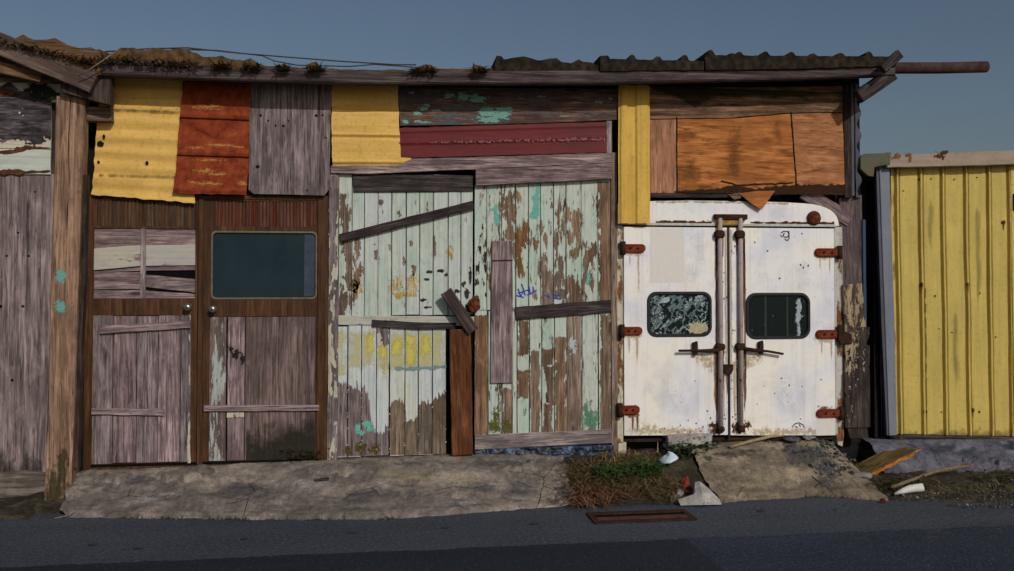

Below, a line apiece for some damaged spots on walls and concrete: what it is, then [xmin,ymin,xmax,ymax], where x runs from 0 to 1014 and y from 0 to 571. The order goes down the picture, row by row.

peeling [0,82,51,147]
peeling [402,104,441,124]
peeling [443,92,514,123]
peeling [498,182,611,305]
peeling [327,169,448,460]
peeling [454,224,488,435]
peeling [502,315,582,433]
peeling [600,314,611,429]
corrosion [618,333,638,394]
corrosion [625,230,815,449]
peeling [845,327,870,428]
damp [246,422,315,460]